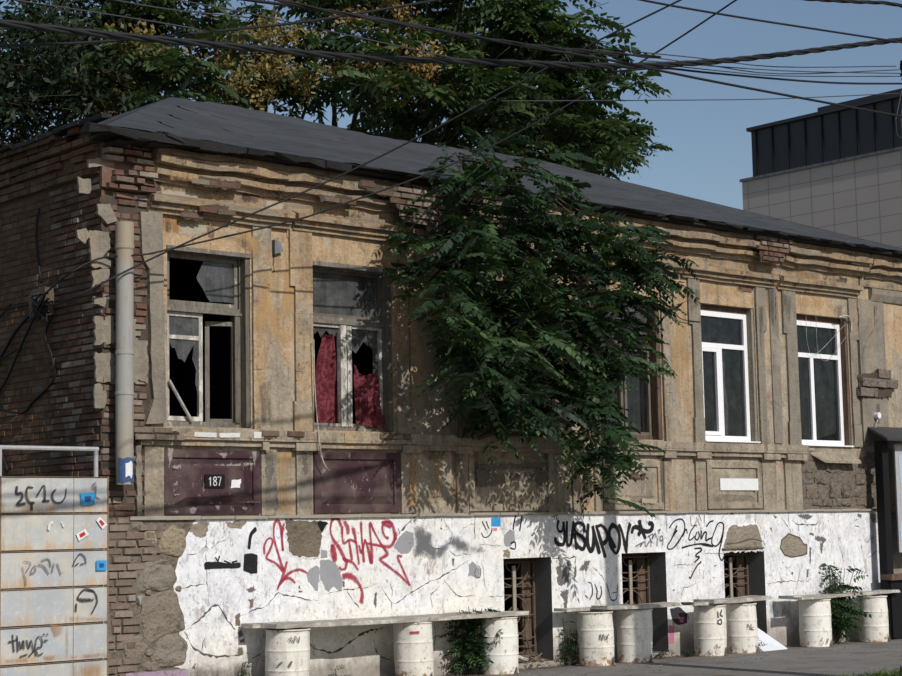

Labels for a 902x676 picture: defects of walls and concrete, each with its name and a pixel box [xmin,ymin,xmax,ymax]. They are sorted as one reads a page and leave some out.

flaking render [756,235,793,264]
flaking render [217,430,330,560]
flaking render [798,450,878,524]
flaking render [102,494,210,676]
crack [184,516,501,661]
flaking render [780,532,826,577]
peeling [235,613,245,655]